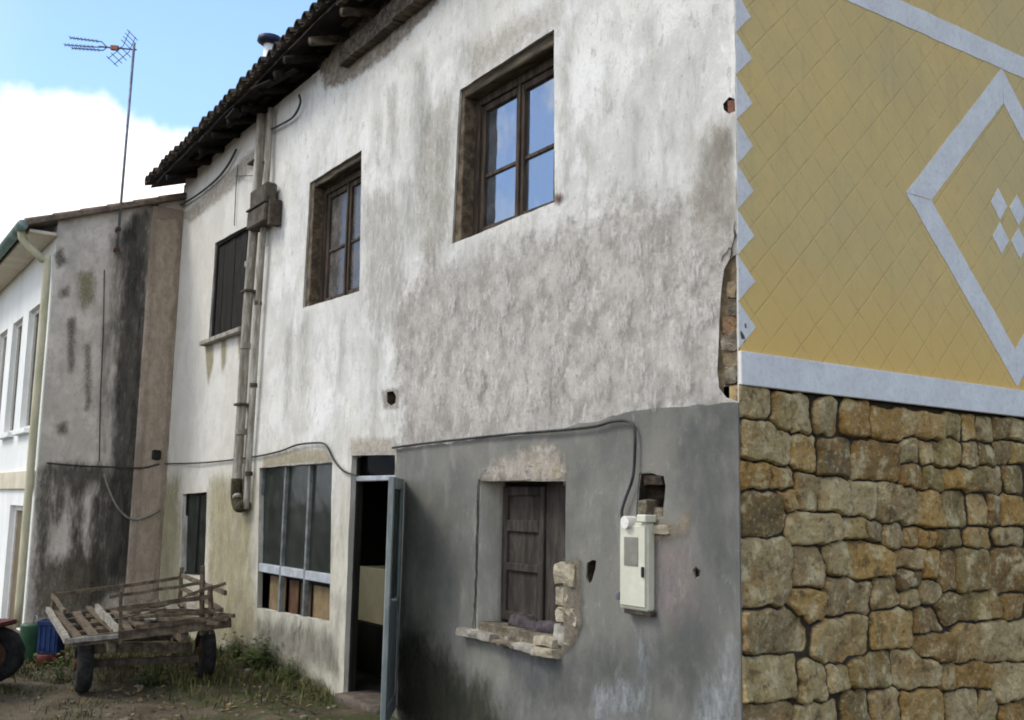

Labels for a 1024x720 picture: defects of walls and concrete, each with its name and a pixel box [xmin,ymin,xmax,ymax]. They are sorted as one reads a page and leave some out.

leakage [35,209,151,619]
peeling [351,97,747,481]
spalling [638,473,700,611]